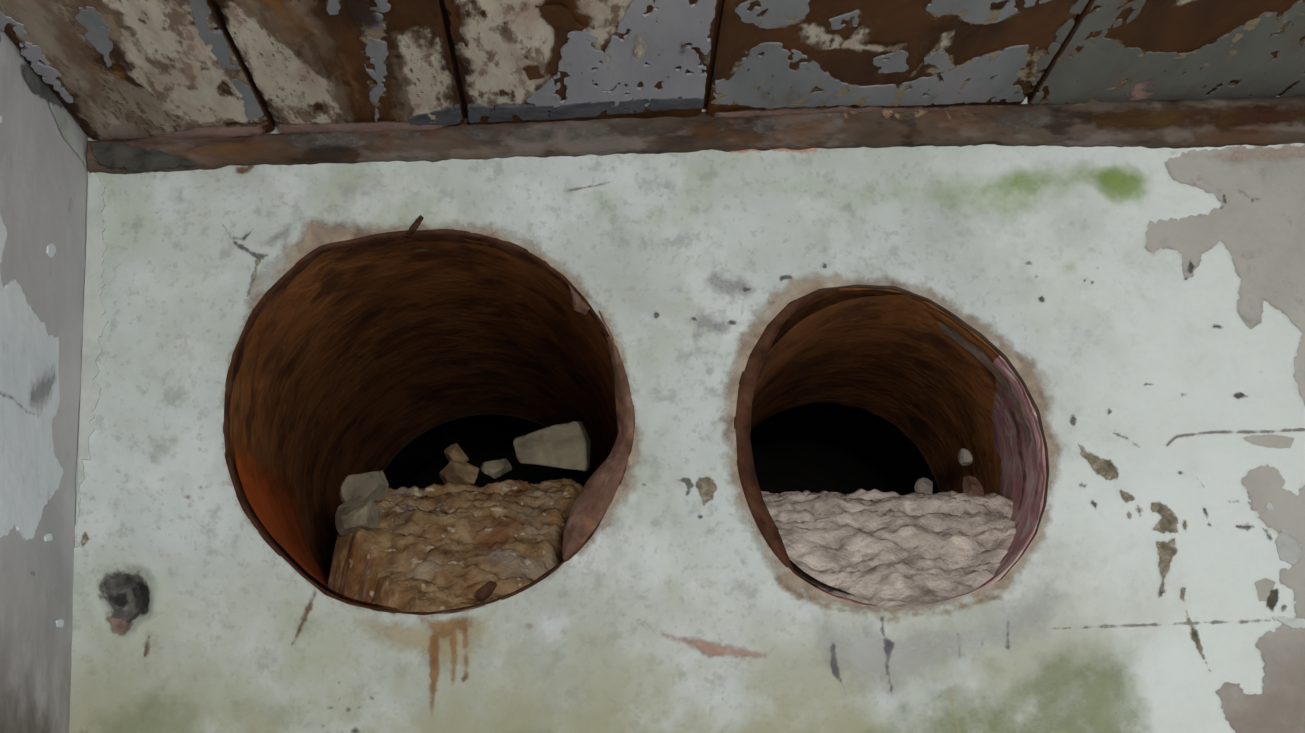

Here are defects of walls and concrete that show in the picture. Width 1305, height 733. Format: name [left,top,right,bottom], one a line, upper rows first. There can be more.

peeling [360,0,1305,141]
peeling [0,0,358,548]
peeling [1145,144,1305,404]
crack [1166,428,1305,446]
spalling [1080,446,1187,597]
spalling [100,572,149,634]
rust [384,619,480,703]
water stain [831,644,841,681]
water stain [881,618,894,691]
crack [1065,620,1259,629]
spalling [1187,618,1204,659]
peeling [1215,464,1305,733]